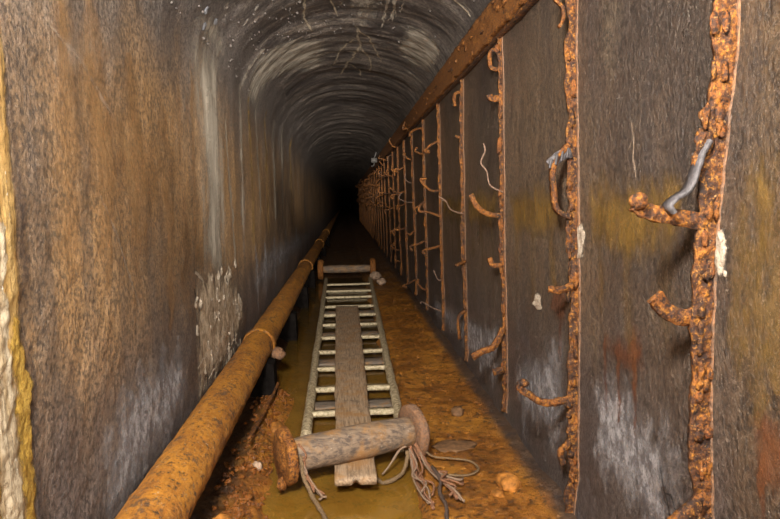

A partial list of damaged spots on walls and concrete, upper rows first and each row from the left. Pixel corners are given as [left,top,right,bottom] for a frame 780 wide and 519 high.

corrosion [710,10,731,35]
crack [333,25,381,76]
corrosion [710,59,729,83]
corrosion [705,102,726,157]
leakage [194,0,348,397]
corrosion [565,180,576,260]
corrosion [704,197,720,222]
leakage [0,38,37,519]
corrosion [701,260,716,283]
leakage [599,398,662,514]